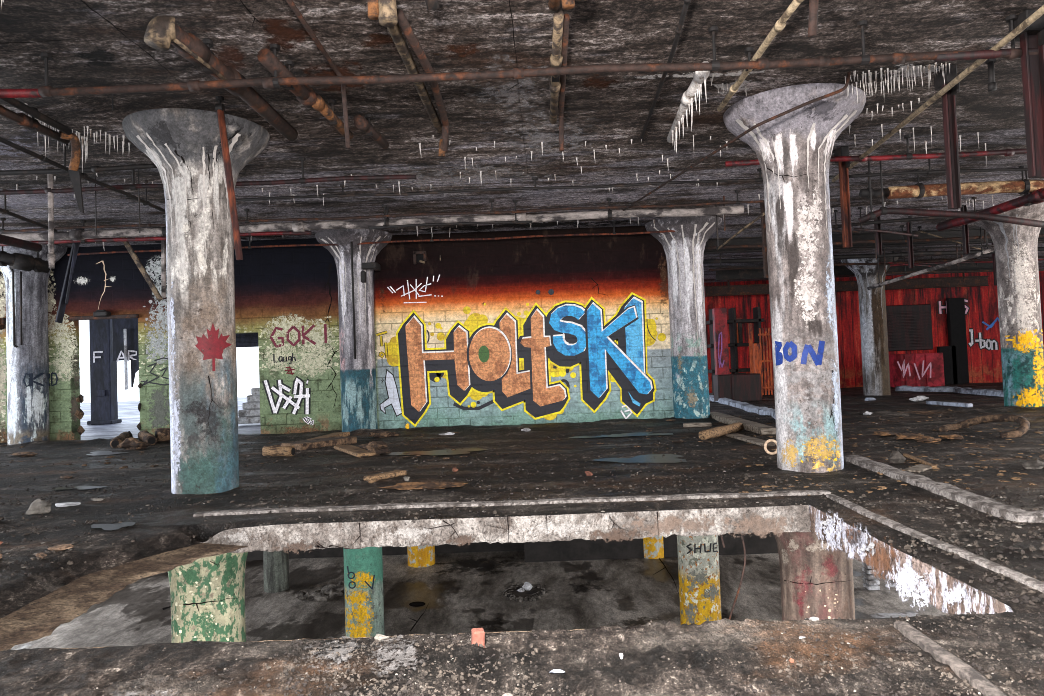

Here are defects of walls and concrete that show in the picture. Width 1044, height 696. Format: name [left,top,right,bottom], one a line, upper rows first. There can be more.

corrosion [258,13,317,52]
corrosion [303,59,365,94]
water stain [708,70,764,94]
water stain [134,117,252,270]
water stain [735,97,857,295]
water stain [406,220,633,233]
water stain [807,319,822,336]
peeling [1004,239,1044,407]
peeling [175,557,235,641]
peeling [347,571,374,638]
peeling [684,570,719,624]